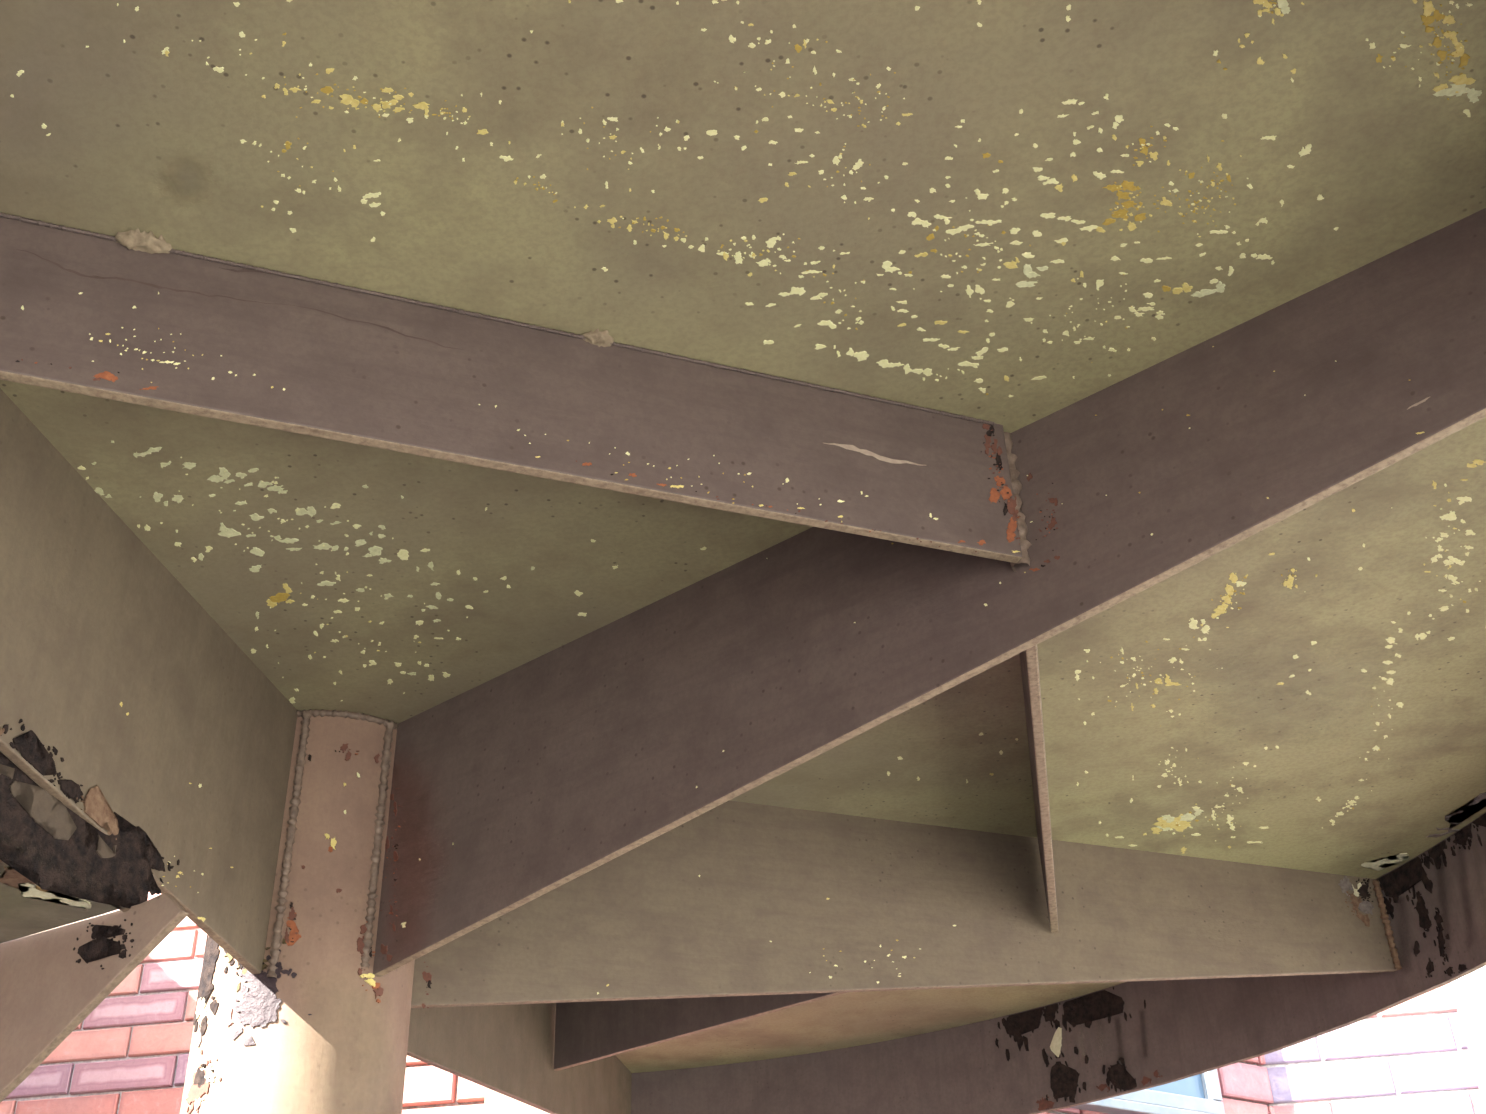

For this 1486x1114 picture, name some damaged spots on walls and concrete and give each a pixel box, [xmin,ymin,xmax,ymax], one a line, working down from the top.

peeling [561,0,912,170]
peeling [240,63,1275,395]
corrosion [93,371,120,382]
corrosion [981,424,1060,572]
peeling [133,447,473,704]
peeling [1075,572,1248,726]
peeling [1359,459,1486,761]
peeling [1099,747,1268,854]
peeling [0,860,91,909]
peeling [219,938,297,1046]
peeling [989,987,1163,1111]
corrosion [1412,891,1467,978]